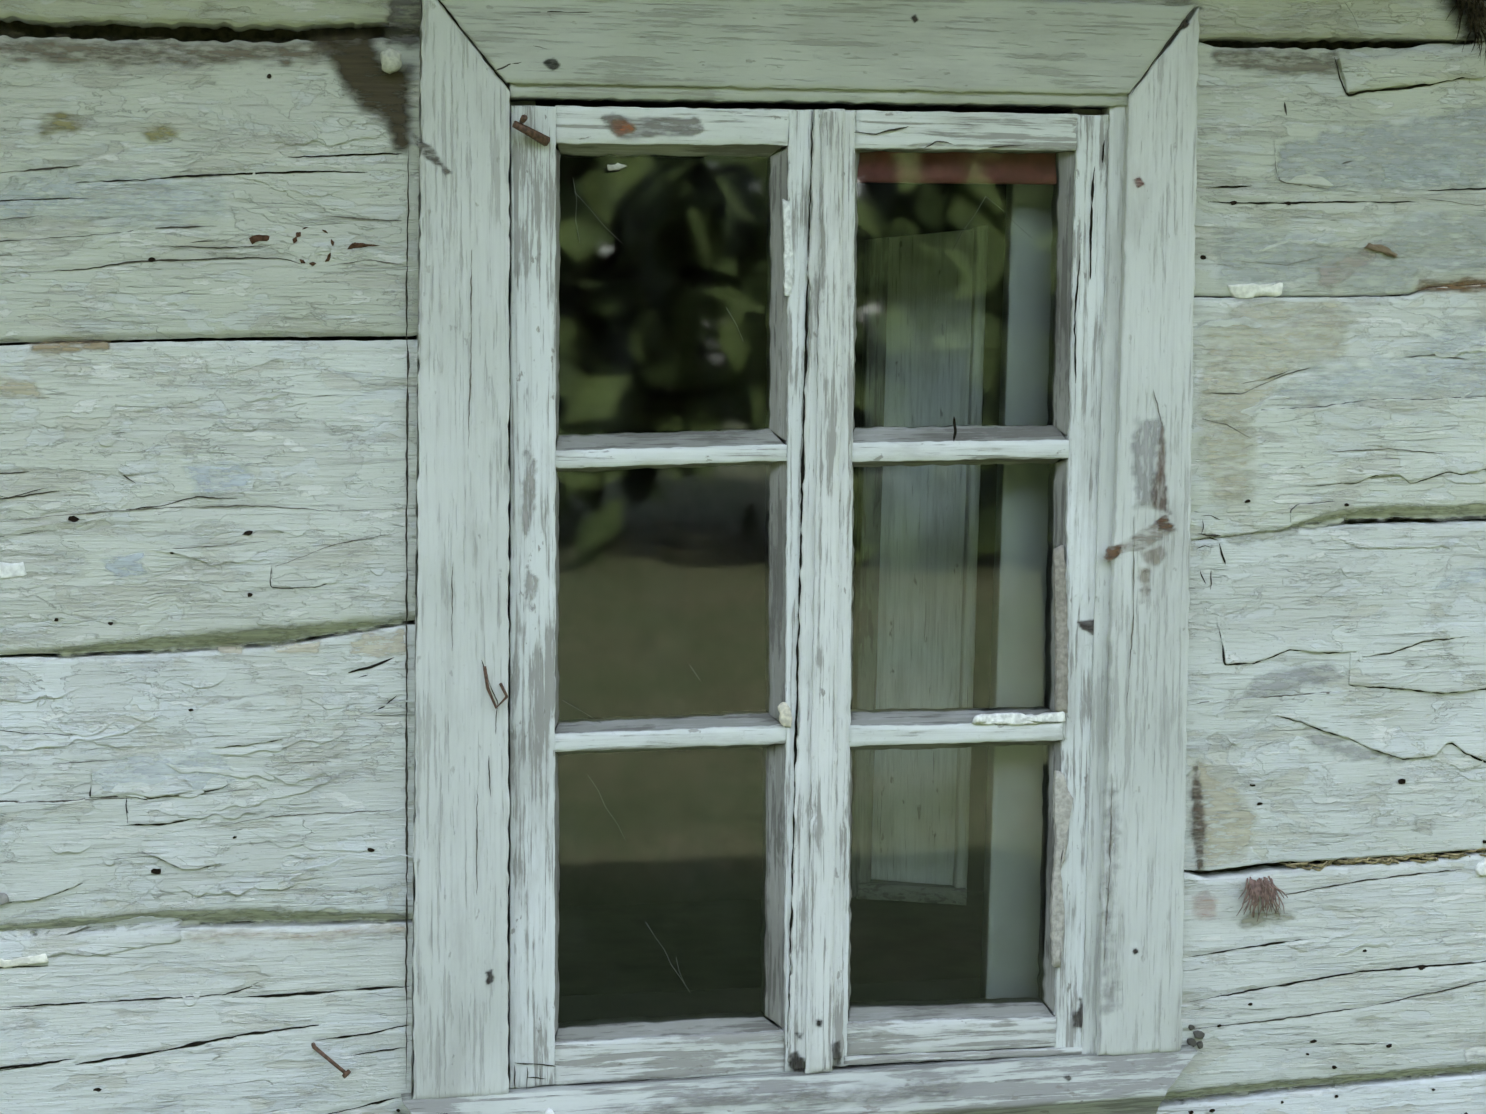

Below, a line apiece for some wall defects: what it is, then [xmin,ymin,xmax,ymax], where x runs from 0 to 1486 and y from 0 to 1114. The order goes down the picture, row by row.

leakage [1440,0,1486,58]
leakage [312,35,411,150]
crack [466,250,474,441]
peeling [1227,282,1283,298]
peeling [1418,278,1486,292]
corrosion [1117,426,1174,591]
peeling [1290,449,1486,523]
peeling [0,562,27,579]
crack [0,150,410,1114]
crack [451,567,498,893]
peeling [0,686,416,908]
peeling [0,916,182,968]